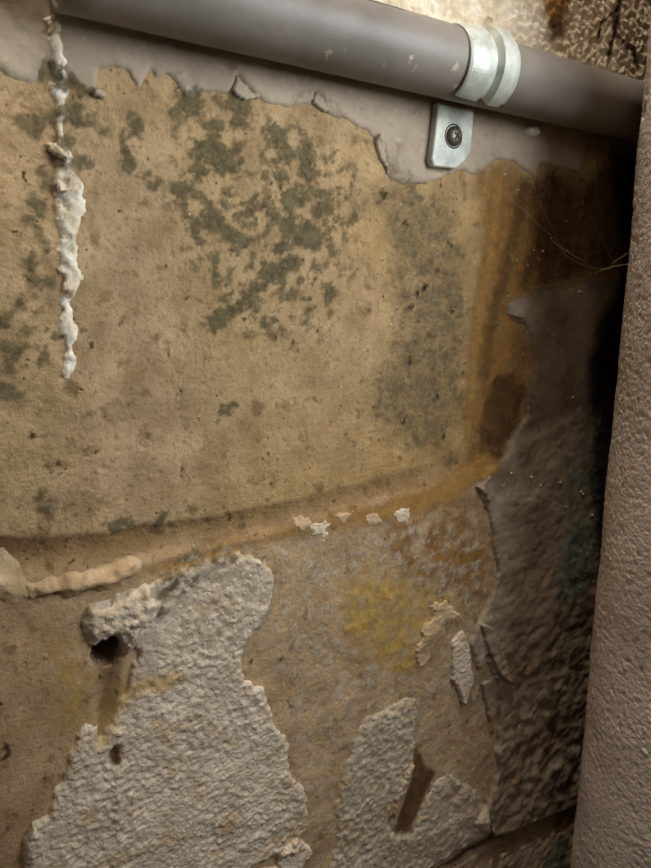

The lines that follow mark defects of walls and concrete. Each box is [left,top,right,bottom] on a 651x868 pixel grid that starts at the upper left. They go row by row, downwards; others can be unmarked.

crack [596,0,639,69]
mould [0,199,56,329]
mould [16,60,109,191]
mould [121,110,144,174]
mould [144,85,358,335]
peeling [0,0,651,378]
mould [374,177,464,447]
peeling [414,277,622,836]
spalling [81,583,161,677]
spalling [109,747,120,764]
peeling [396,749,434,832]
crack [442,814,501,865]